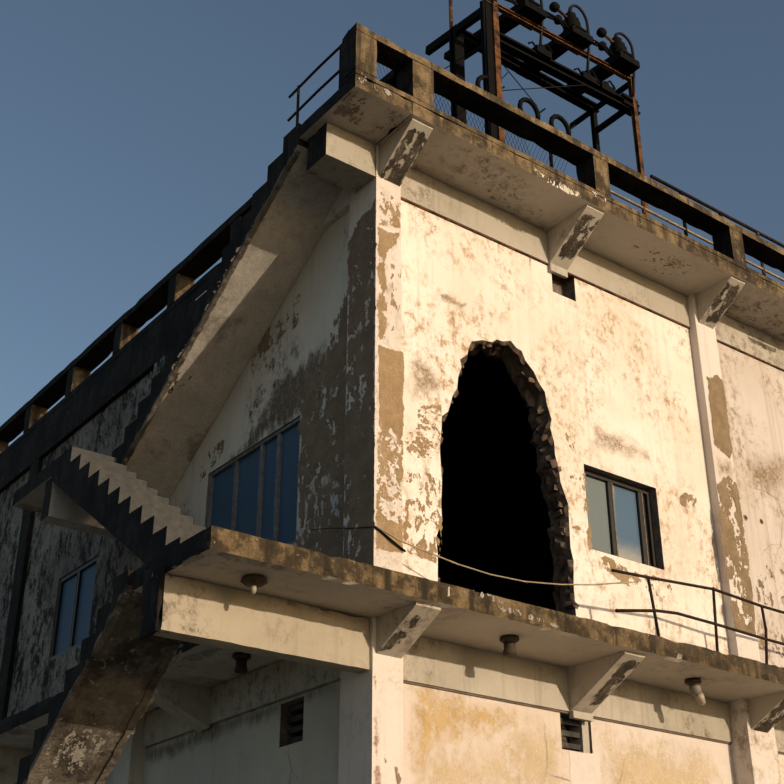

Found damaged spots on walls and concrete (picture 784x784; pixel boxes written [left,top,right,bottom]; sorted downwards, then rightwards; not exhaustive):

peeling [333,76,427,187]
spalling [542,174,607,202]
peeling [559,214,599,260]
peeling [231,191,459,565]
peeling [707,375,733,459]
spalling [458,340,593,613]
spalling [464,590,558,628]
peeling [590,660,640,705]
water stain [416,694,500,760]
peeling [754,699,784,733]